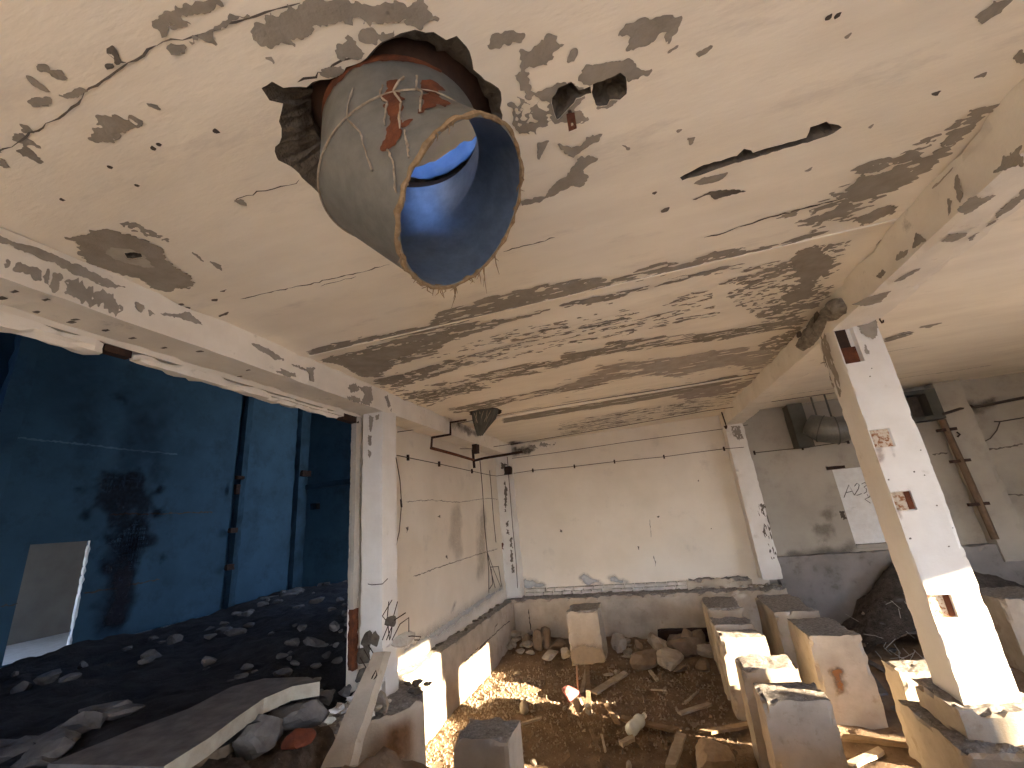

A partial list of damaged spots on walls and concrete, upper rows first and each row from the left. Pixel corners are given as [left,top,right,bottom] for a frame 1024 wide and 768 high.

crack [0,3,300,151]
rust [321,54,451,151]
peeling [152,0,682,206]
crack [236,180,299,200]
peeling [0,221,202,325]
crack [242,264,390,299]
peeling [251,104,1024,458]
damp [82,472,163,631]
rust [831,667,844,694]